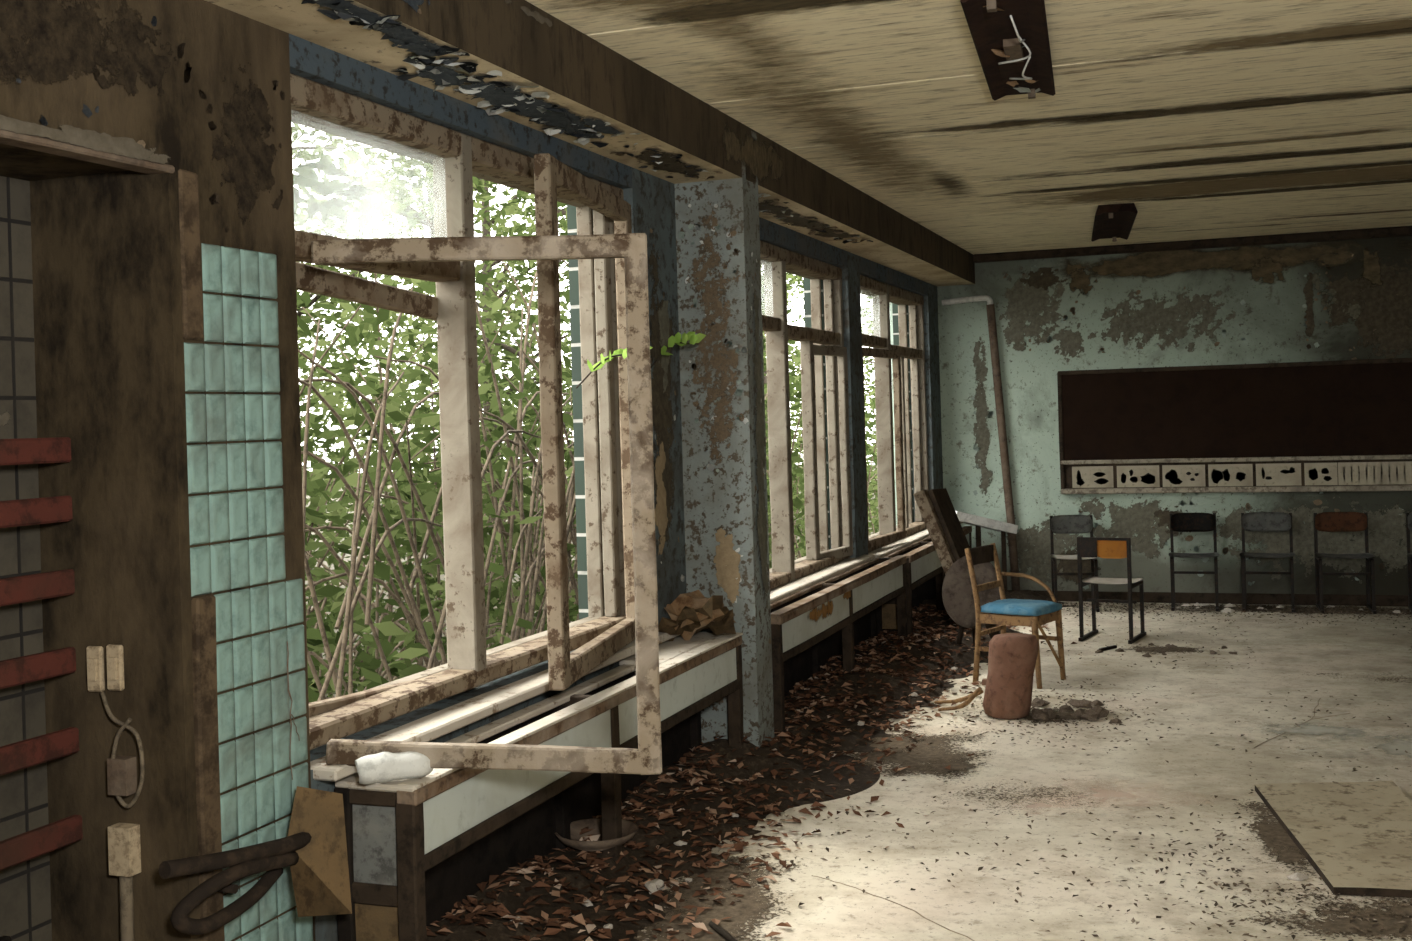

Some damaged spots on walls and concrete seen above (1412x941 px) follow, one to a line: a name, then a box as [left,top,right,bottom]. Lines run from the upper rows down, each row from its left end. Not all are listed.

peeling [301,0,723,179]
water stain [573,0,967,195]
water stain [910,88,1412,133]
water stain [1102,18,1412,63]
peeling [996,264,1247,362]
peeling [1302,272,1319,348]
peeling [967,337,993,506]
peeling [1006,492,1412,590]